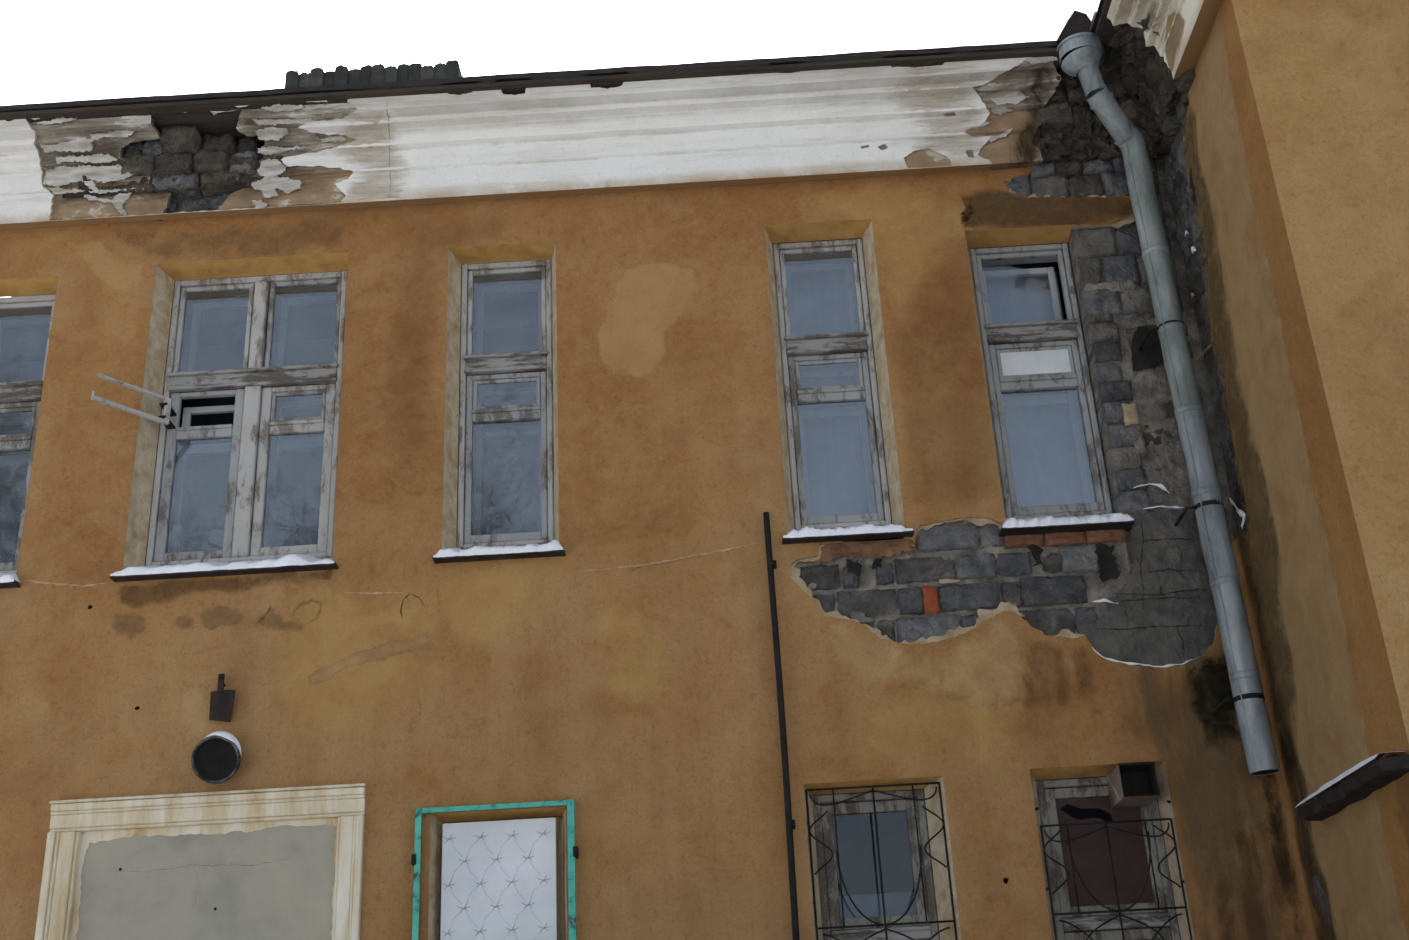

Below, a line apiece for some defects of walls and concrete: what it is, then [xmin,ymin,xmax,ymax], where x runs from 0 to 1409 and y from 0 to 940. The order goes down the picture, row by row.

spalling [30,103,358,222]
spalling [790,56,1218,667]
spalling [1099,12,1248,542]
damp [1143,114,1336,940]